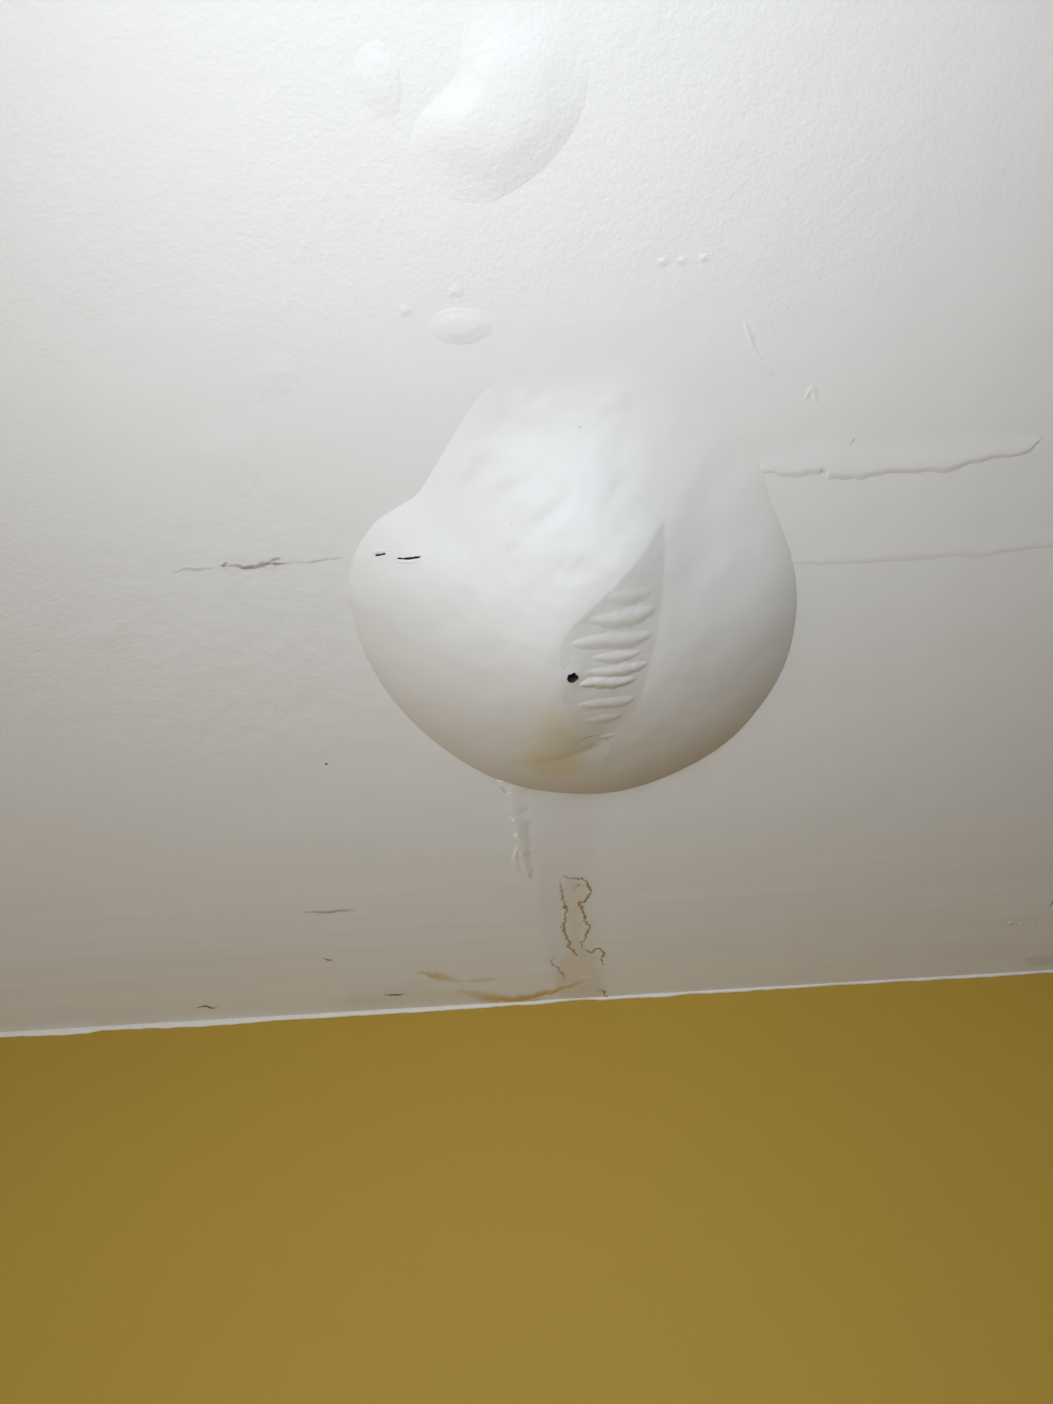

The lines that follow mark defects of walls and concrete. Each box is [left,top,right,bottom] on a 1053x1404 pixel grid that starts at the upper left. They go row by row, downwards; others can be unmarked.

crack [208,552,309,581]
damp [528,789,612,999]